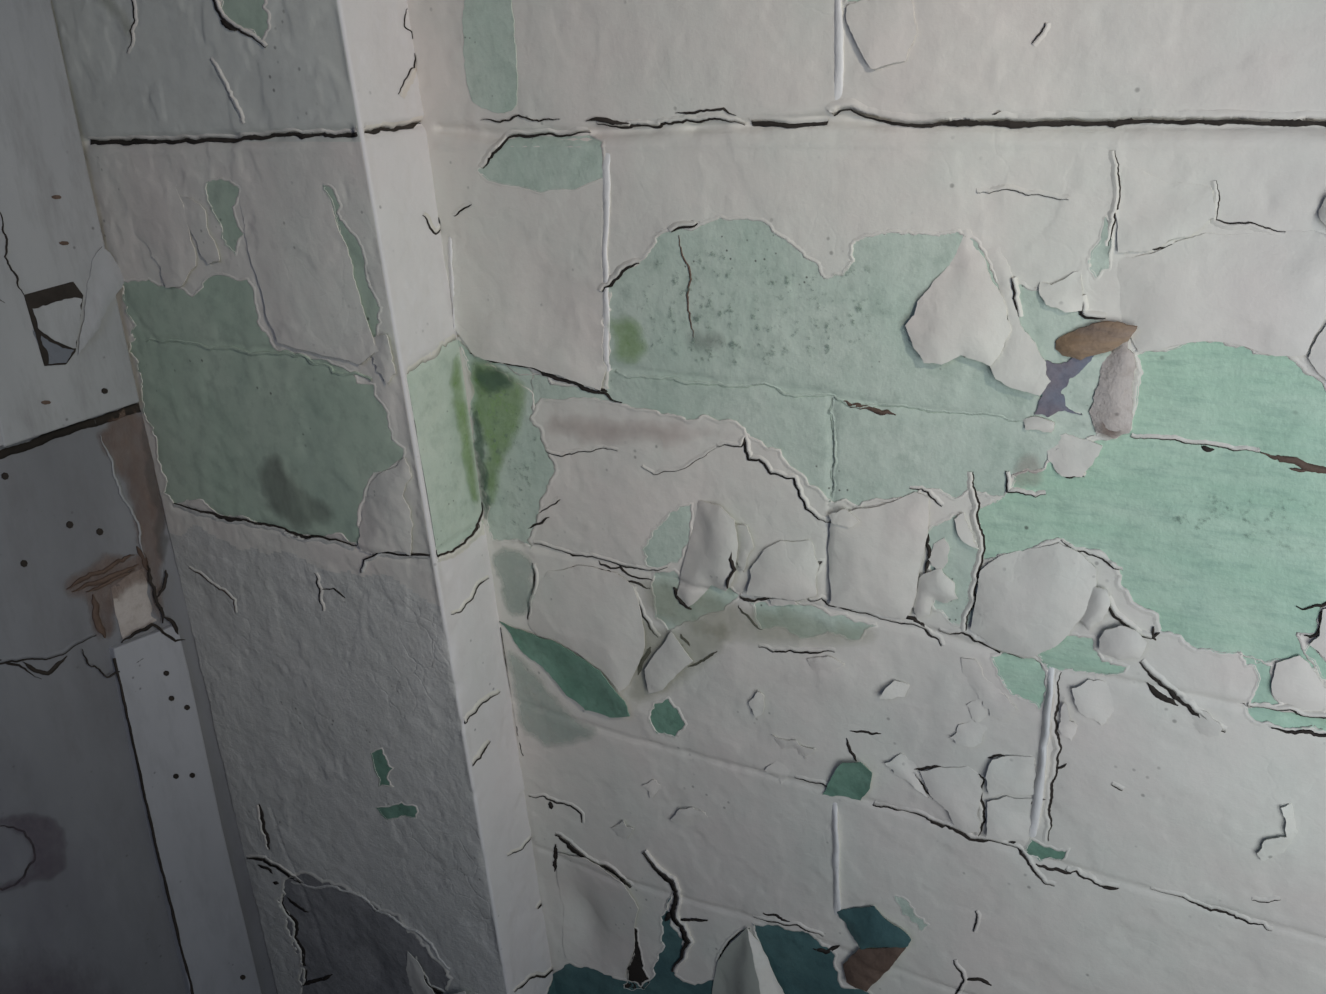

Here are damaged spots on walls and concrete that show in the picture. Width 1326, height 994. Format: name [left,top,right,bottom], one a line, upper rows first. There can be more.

peeling [462,0,518,113]
peeling [842,0,917,69]
crack [478,98,1326,246]
peeling [78,131,1326,741]
crack [470,353,1042,523]
crack [464,497,716,766]
crack [808,471,1087,659]
flaking render [274,870,466,994]
peeling [370,748,394,787]
peeling [376,801,419,820]
crack [507,793,839,978]
crack [873,671,1281,931]